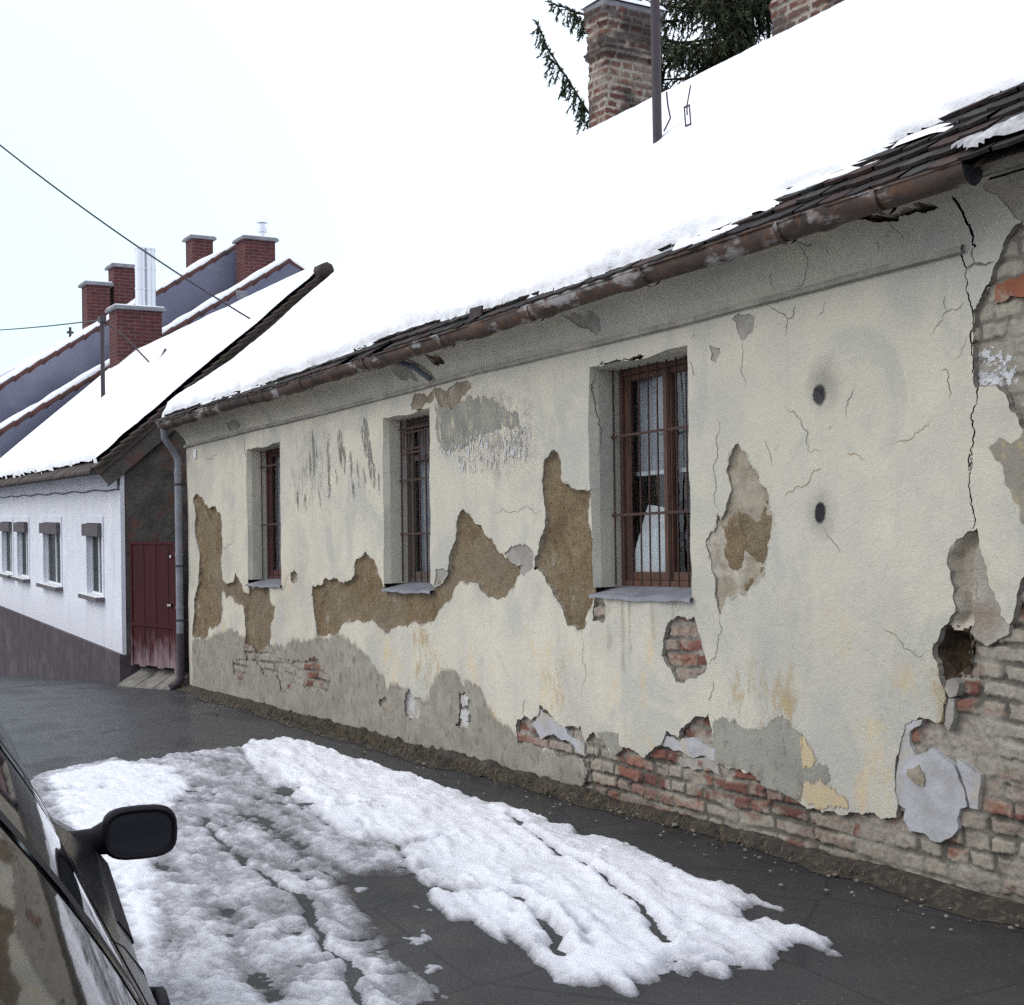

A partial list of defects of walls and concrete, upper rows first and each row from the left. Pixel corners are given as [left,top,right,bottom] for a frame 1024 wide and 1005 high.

crack [954,198,992,268]
flaking render [970,170,1024,523]
water stain [293,418,379,536]
peeling [389,363,531,473]
flaking render [192,443,1024,904]